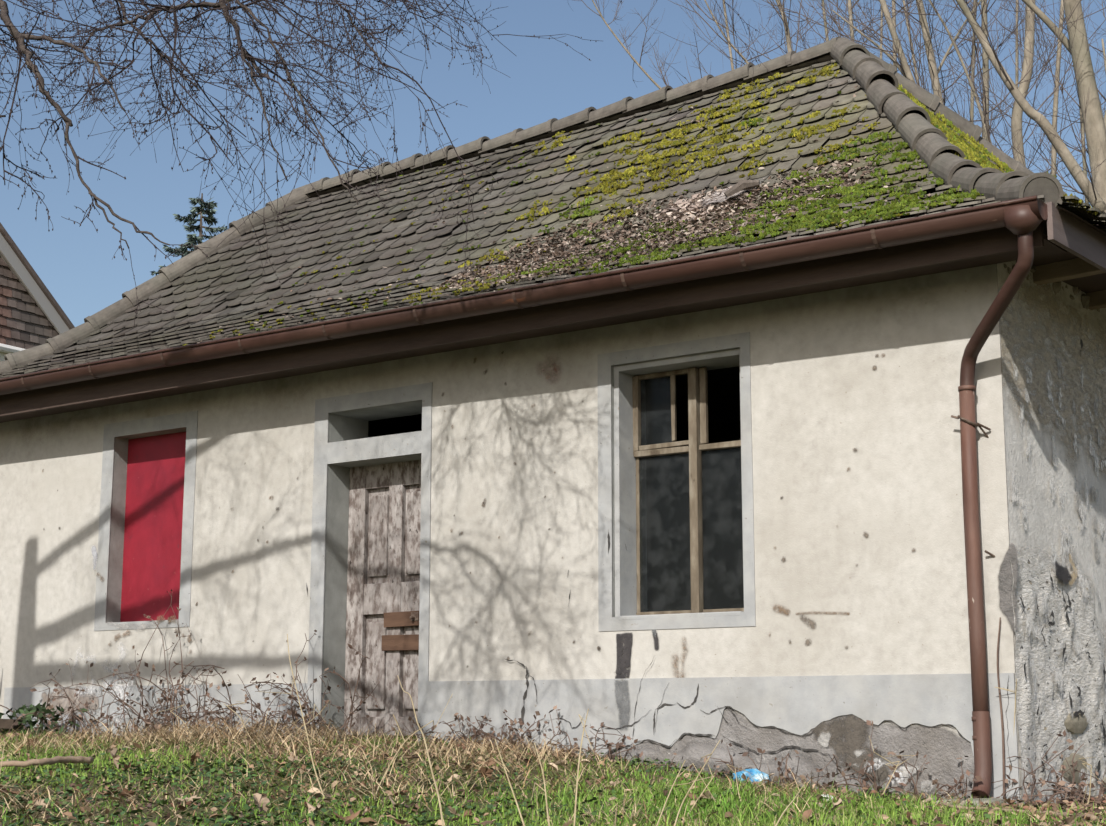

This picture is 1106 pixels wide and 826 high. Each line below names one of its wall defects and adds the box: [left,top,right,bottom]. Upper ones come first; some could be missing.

flaking render [998,284,1106,804]
leakage [615,680,630,728]
crack [455,657,839,778]
flaking render [603,708,974,801]